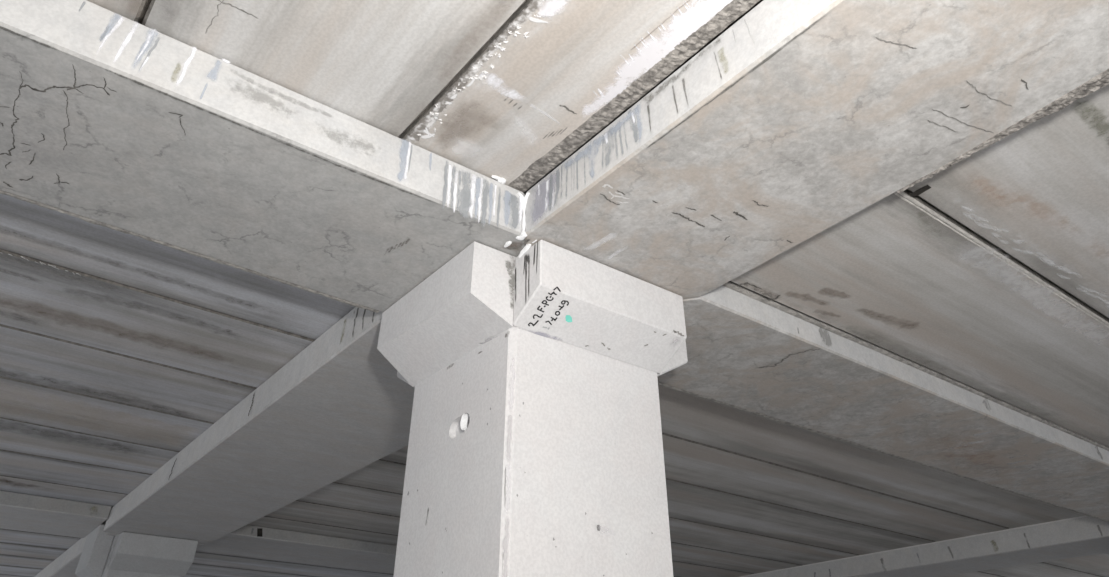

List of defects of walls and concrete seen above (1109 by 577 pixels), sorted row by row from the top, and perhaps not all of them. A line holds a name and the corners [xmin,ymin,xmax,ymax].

crack [0,64,116,188]
water stain [100,15,137,60]
water stain [177,47,196,84]
crack [205,0,257,34]
water stain [398,0,566,180]
water stain [442,108,642,302]